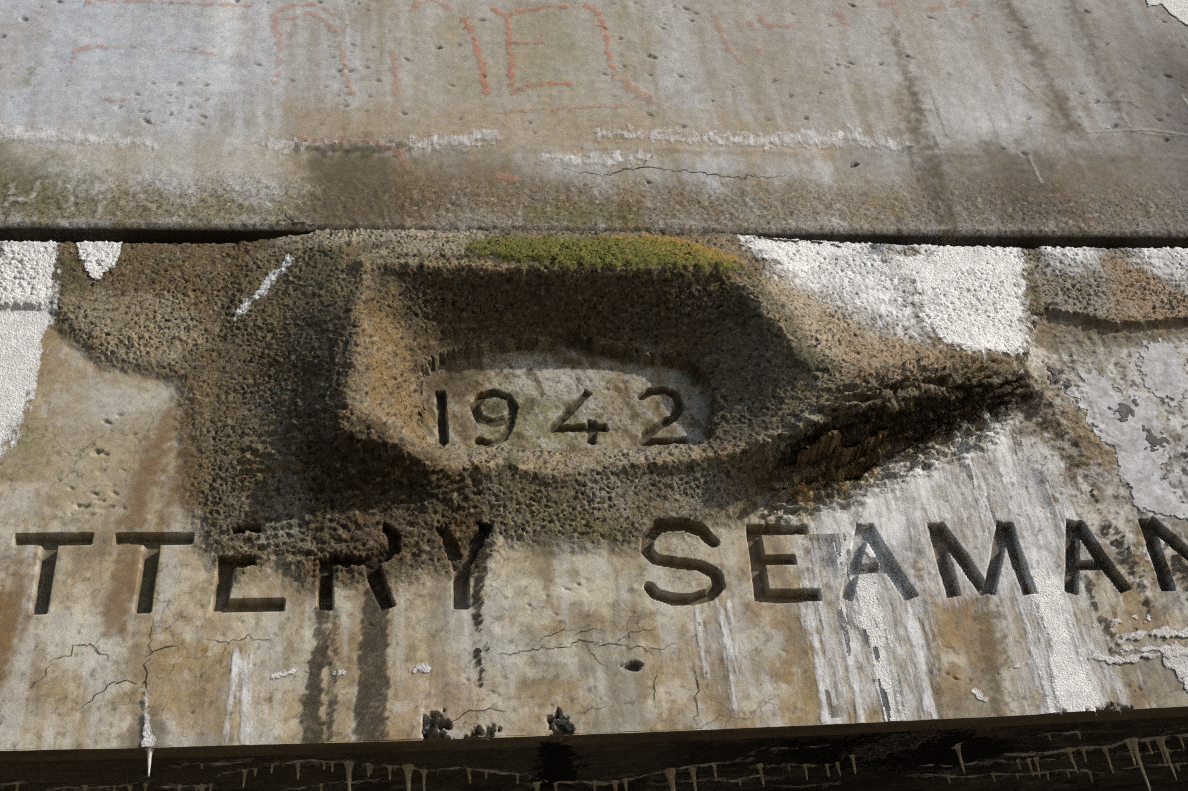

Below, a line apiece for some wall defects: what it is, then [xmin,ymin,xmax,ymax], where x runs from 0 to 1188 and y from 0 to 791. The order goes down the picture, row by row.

peeling [1147,0,1188,25]
crack [563,154,793,179]
damp [0,240,62,457]
spalling [766,305,1188,519]
damp [45,234,1188,791]
crack [26,619,179,714]
crack [485,627,676,708]